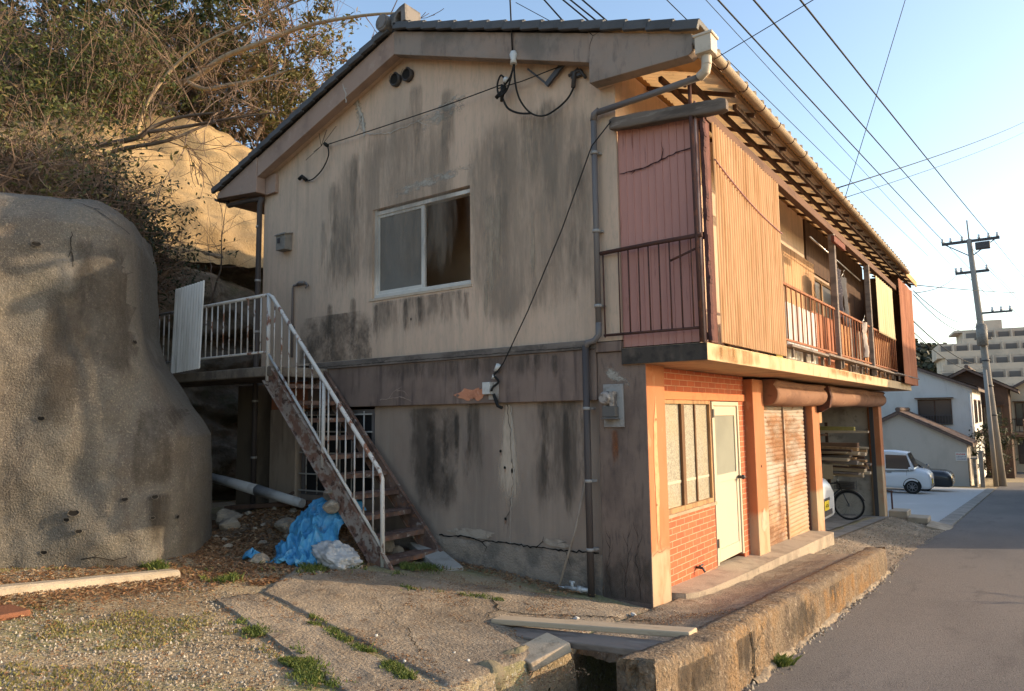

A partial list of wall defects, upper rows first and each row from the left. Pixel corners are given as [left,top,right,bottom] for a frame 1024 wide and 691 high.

crack [620,142,690,174]
spalling [454,387,484,401]
crack [439,405,670,621]